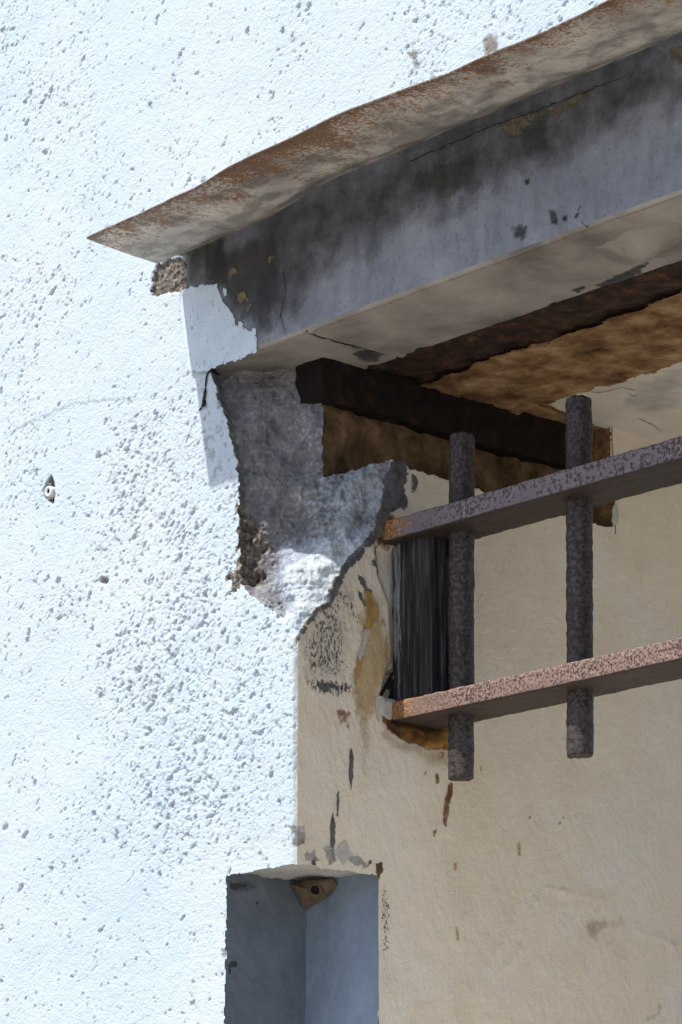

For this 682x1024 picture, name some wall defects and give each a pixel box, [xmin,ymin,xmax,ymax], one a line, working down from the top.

crack [400,76,626,167]
water stain [184,105,569,317]
water stain [549,206,588,227]
water stain [353,349,381,362]
spalling [150,256,449,643]
spalling [474,449,566,493]
spalling [592,427,614,462]
spalling [593,501,619,534]
corrosion [337,590,449,759]
corrosion [425,772,453,835]
peeling [290,825,391,950]